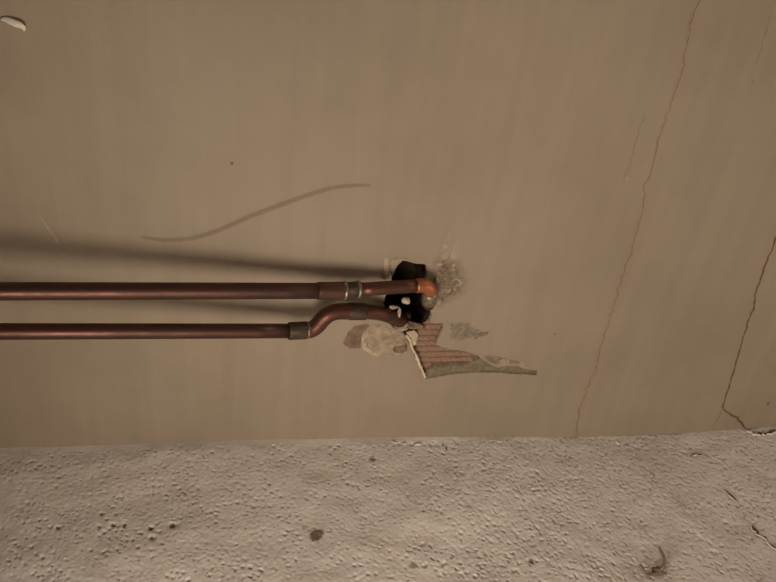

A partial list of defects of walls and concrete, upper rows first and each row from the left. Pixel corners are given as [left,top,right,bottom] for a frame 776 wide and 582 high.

spalling [380,257,427,281]
flaking render [383,293,537,379]
crack [575,0,702,437]
crack [712,235,776,436]